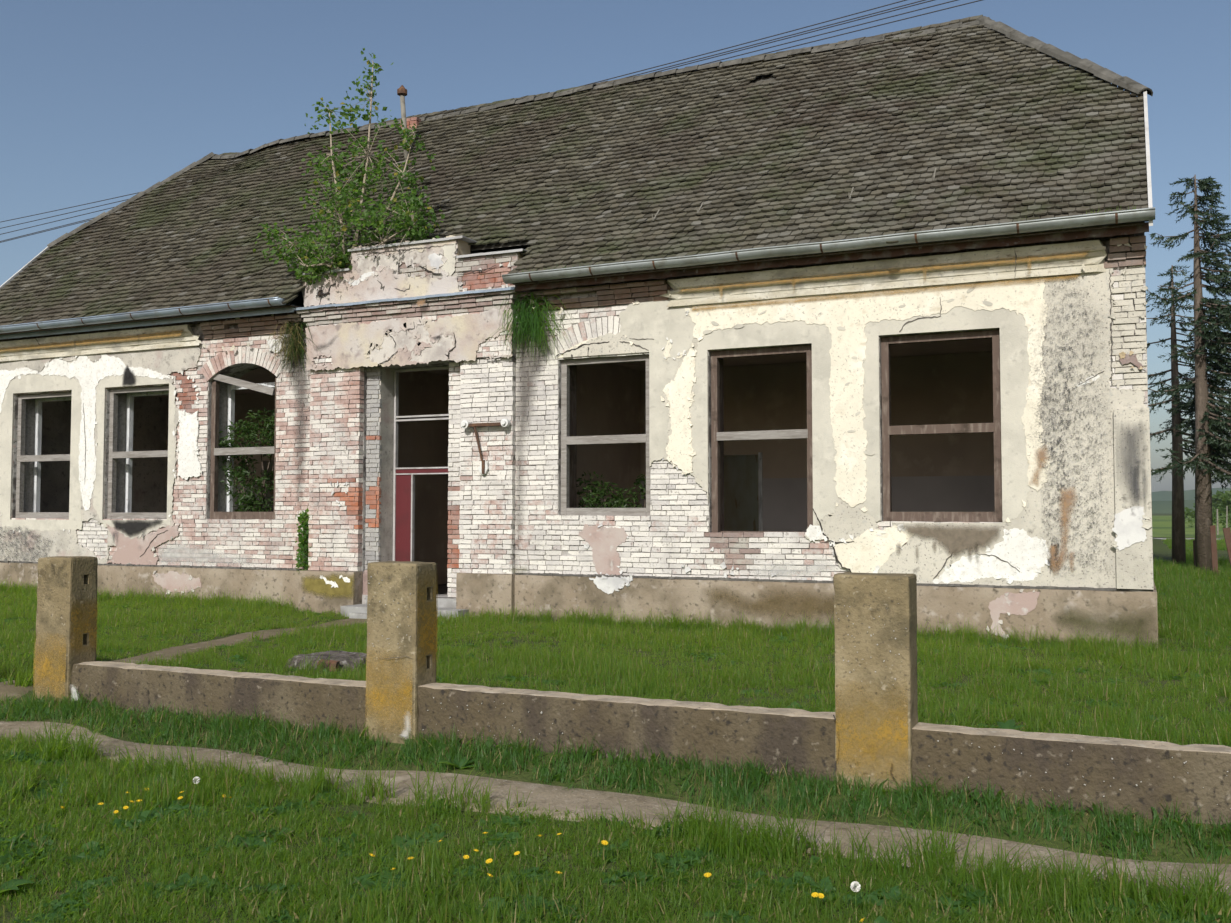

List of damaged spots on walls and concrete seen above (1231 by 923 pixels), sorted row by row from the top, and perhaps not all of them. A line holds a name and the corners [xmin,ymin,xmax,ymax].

peeling [344,244,513,292]
peeling [364,319,456,364]
spalling [481,330,513,360]
spalling [1073,267,1148,391]
water stain [681,251,1105,569]
peeling [0,354,202,594]
spalling [328,477,381,529]
peeling [619,287,1052,638]
water stain [1125,431,1138,493]
flaking render [578,523,633,591]
crack [933,554,1020,579]